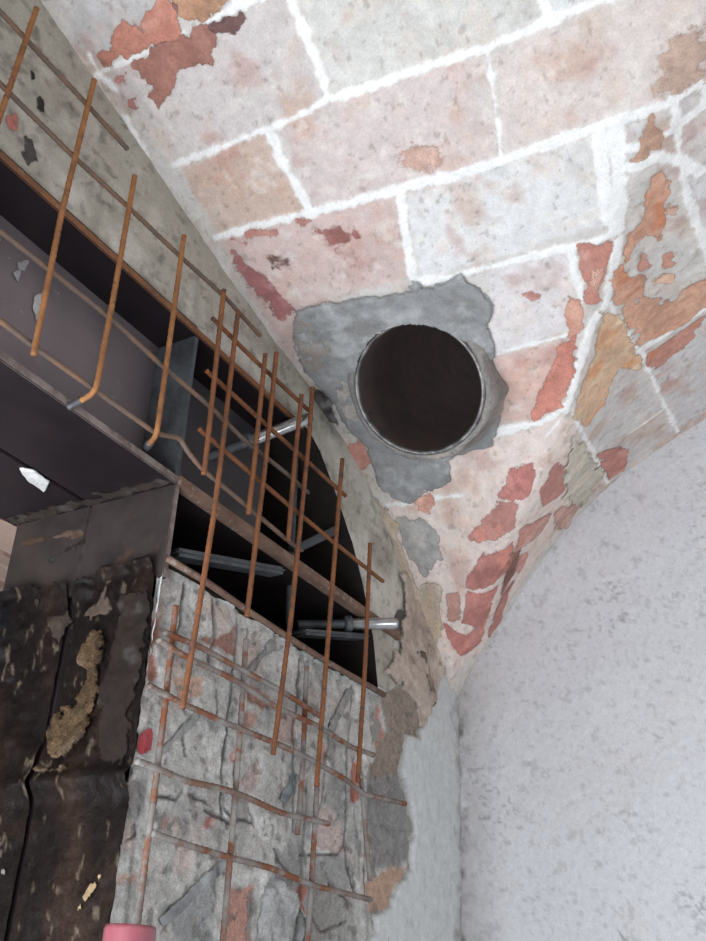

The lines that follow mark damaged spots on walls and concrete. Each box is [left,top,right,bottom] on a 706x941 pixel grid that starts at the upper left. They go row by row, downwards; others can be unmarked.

peeling [531,171,706,427]
flaking render [0,0,419,941]
spalling [414,493,435,514]
flaking render [443,462,581,656]
peeling [596,447,629,480]